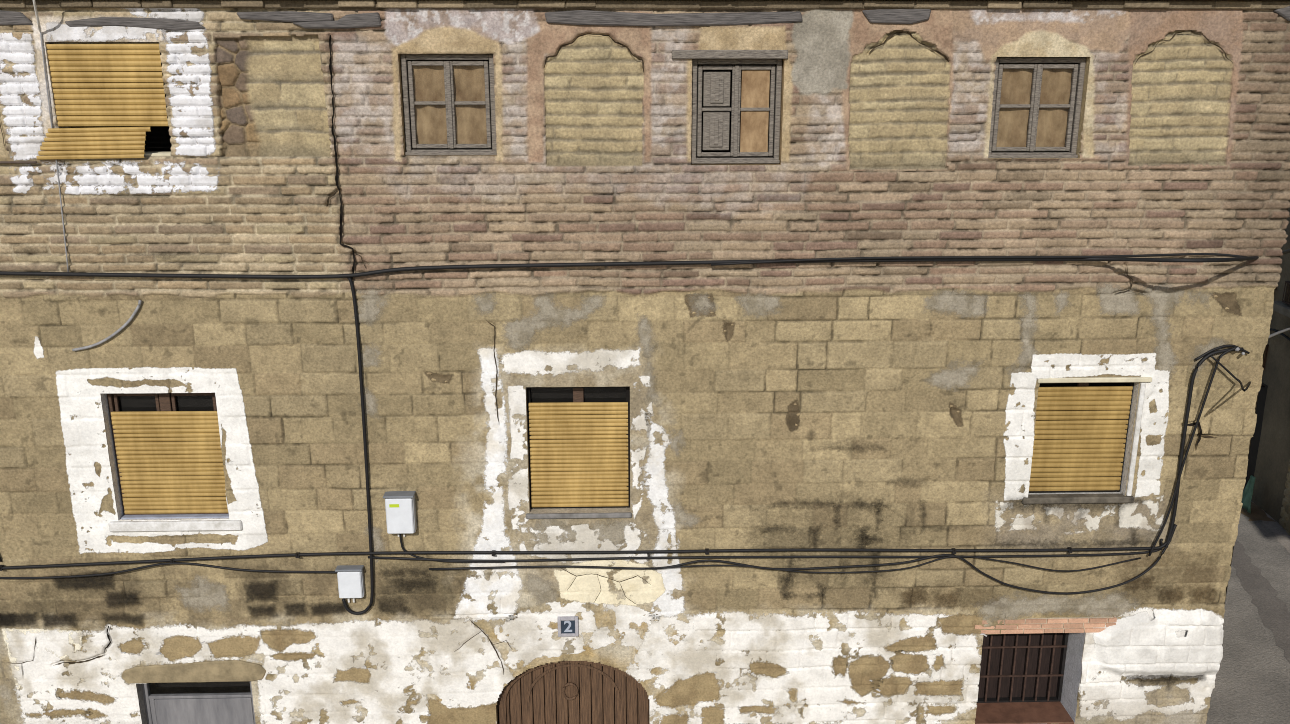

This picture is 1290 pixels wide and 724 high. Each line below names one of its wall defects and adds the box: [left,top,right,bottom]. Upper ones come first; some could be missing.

peeling [0,8,219,195]
peeling [34,336,44,359]
peeling [995,353,1170,535]
peeling [0,347,987,724]
water stain [0,614,76,626]
water stain [54,573,142,625]
water stain [247,583,345,617]
crack [561,568,651,605]
peeling [1078,607,1216,721]